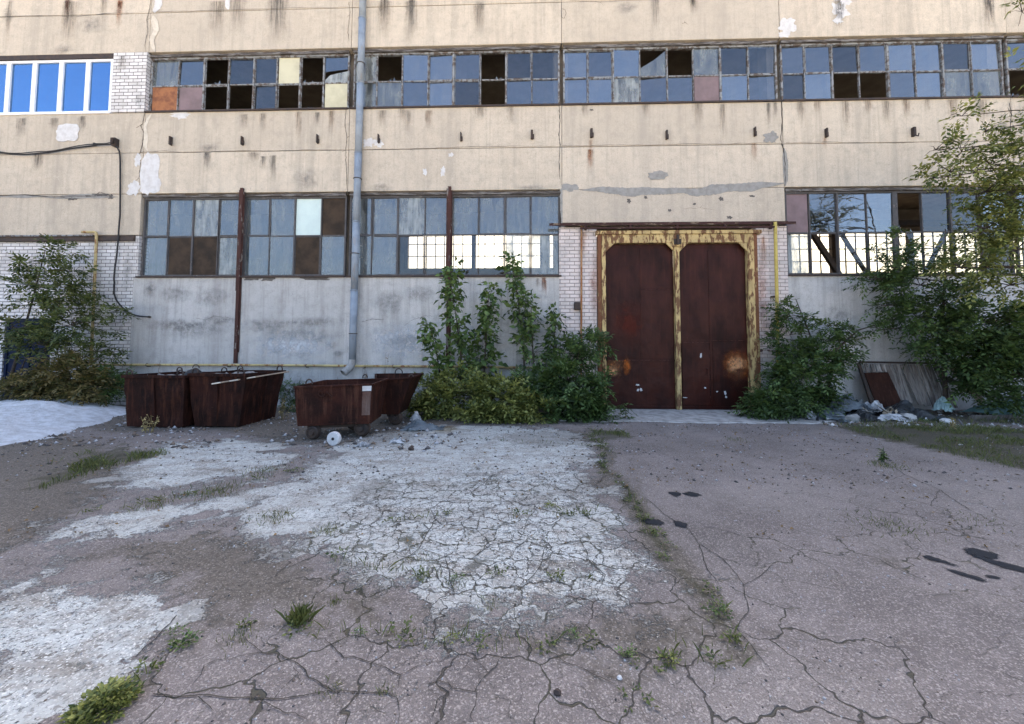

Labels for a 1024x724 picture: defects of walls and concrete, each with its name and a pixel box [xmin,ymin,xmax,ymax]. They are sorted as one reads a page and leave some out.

peeling [778,18,797,38]
spalling [832,0,852,24]
peeling [0,113,161,200]
corrosion [727,355,747,379]
crack [649,500,771,671]
crack [153,637,401,707]
crack [428,643,626,692]